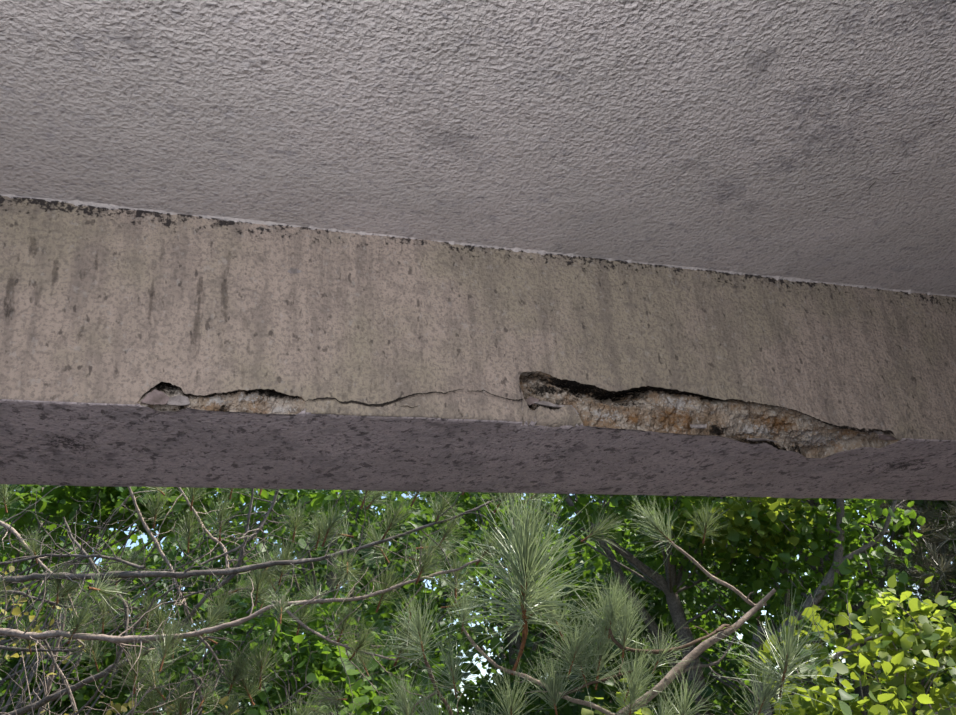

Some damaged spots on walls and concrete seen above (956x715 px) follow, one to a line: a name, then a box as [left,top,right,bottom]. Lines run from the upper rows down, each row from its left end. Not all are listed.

spalling [137,382,306,415]
crack [307,389,523,422]
spalling [519,371,898,458]